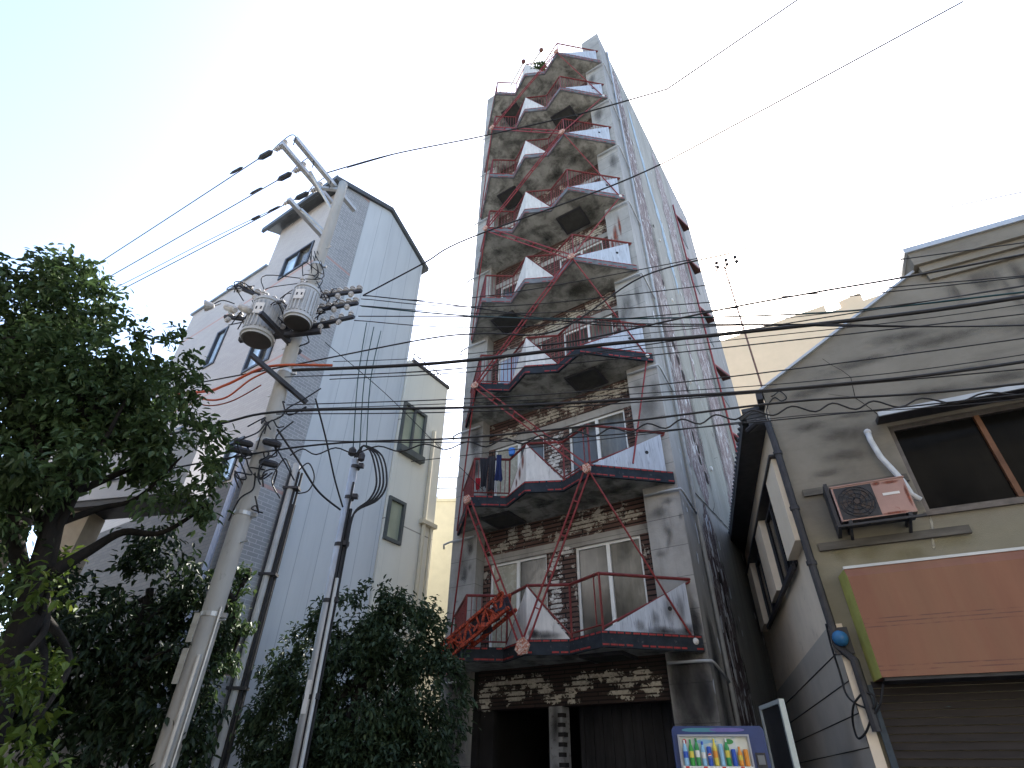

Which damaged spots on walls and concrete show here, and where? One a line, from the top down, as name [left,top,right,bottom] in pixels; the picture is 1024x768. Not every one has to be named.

peeling [488,522,545,553]
peeling [544,507,645,632]
peeling [476,667,662,712]